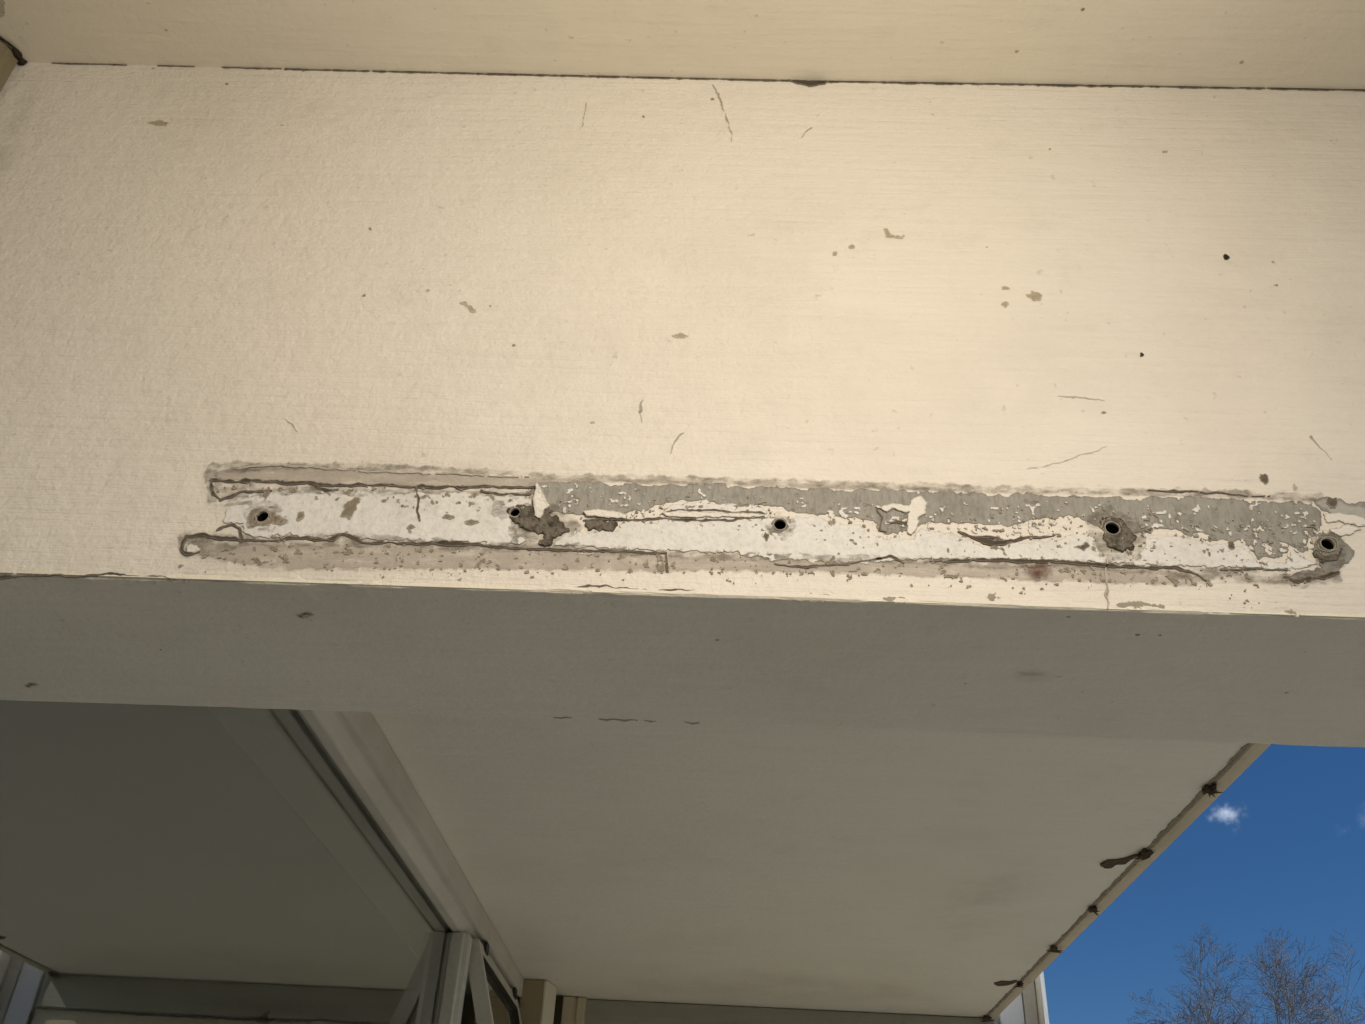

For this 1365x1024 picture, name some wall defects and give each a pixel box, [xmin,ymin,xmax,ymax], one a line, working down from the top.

peeling [172,463,1365,609]